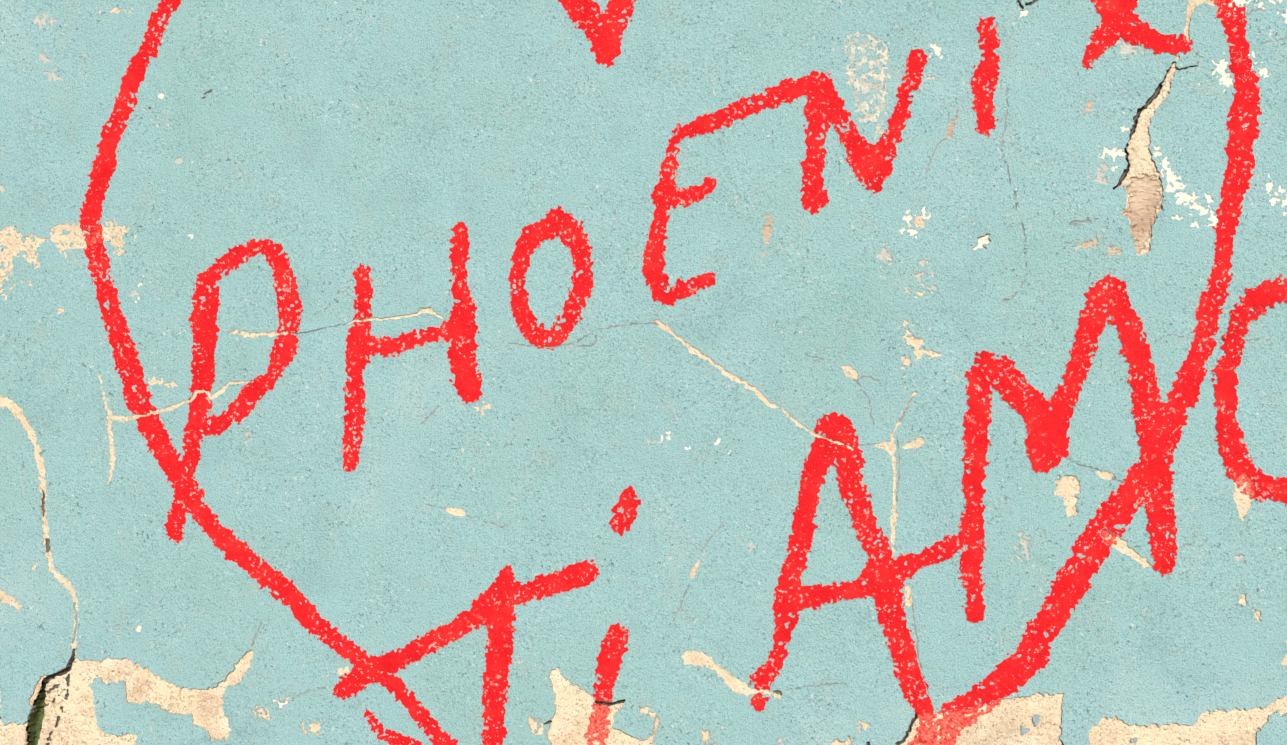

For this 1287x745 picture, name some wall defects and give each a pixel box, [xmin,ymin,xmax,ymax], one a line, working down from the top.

spalling [1069,52,1233,257]
peeling [0,218,129,300]
crack [229,307,447,338]
crack [98,374,248,484]
crack [509,319,925,557]
crack [426,504,512,528]
crack [0,395,79,745]
crack [671,522,845,699]
peeling [0,650,253,745]
peeling [521,667,660,745]
peeling [896,692,1064,745]
peeling [1088,696,1287,745]